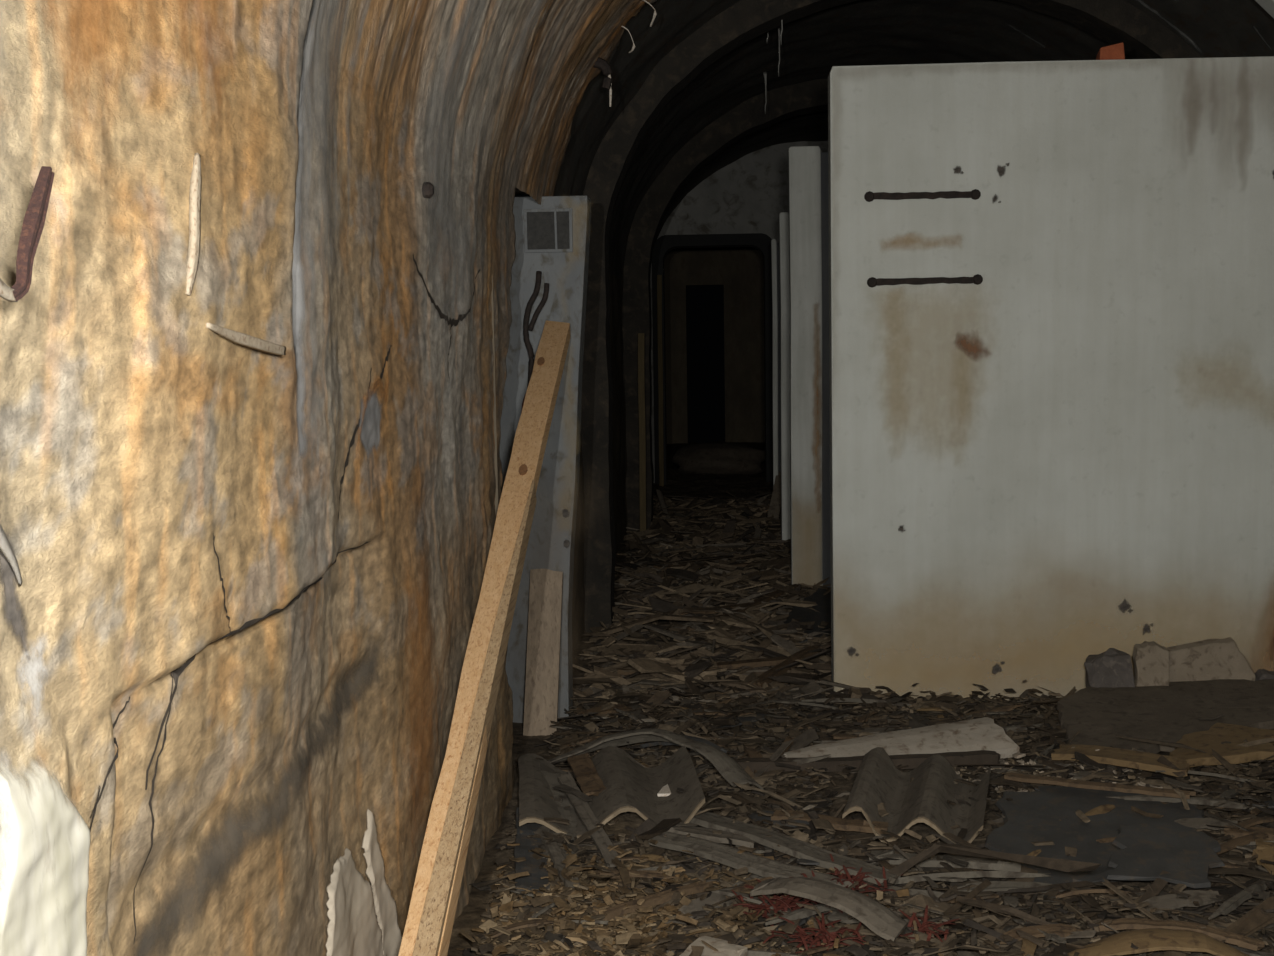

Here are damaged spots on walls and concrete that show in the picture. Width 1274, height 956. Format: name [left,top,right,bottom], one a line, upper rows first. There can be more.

corrosion [957,336,987,358]
peeling [0,524,45,709]
water stain [856,617,1236,700]
crack [90,697,130,832]
crack [133,533,370,942]
peeling [326,809,403,956]